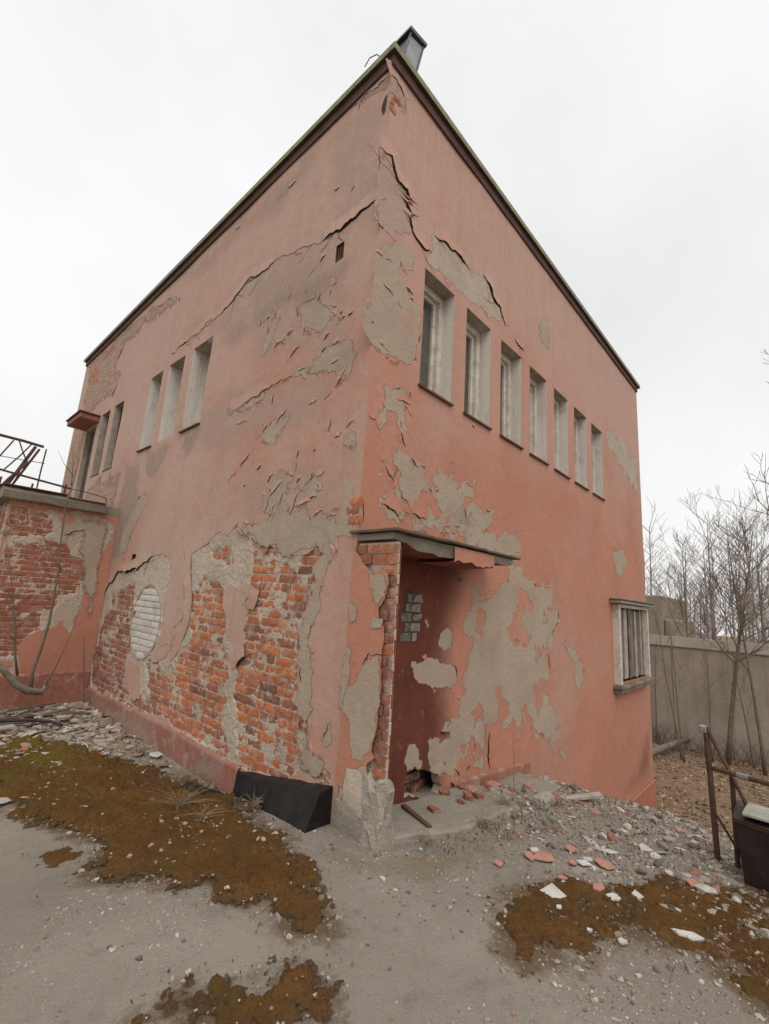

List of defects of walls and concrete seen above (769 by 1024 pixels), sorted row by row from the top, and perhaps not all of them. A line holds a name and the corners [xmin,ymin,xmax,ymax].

crack [172,133,526,359]
peeling [227,144,502,445]
spalling [0,492,150,674]
crack [104,548,153,593]
spalling [92,453,364,785]
peeling [338,647,381,761]
peeling [367,384,585,793]